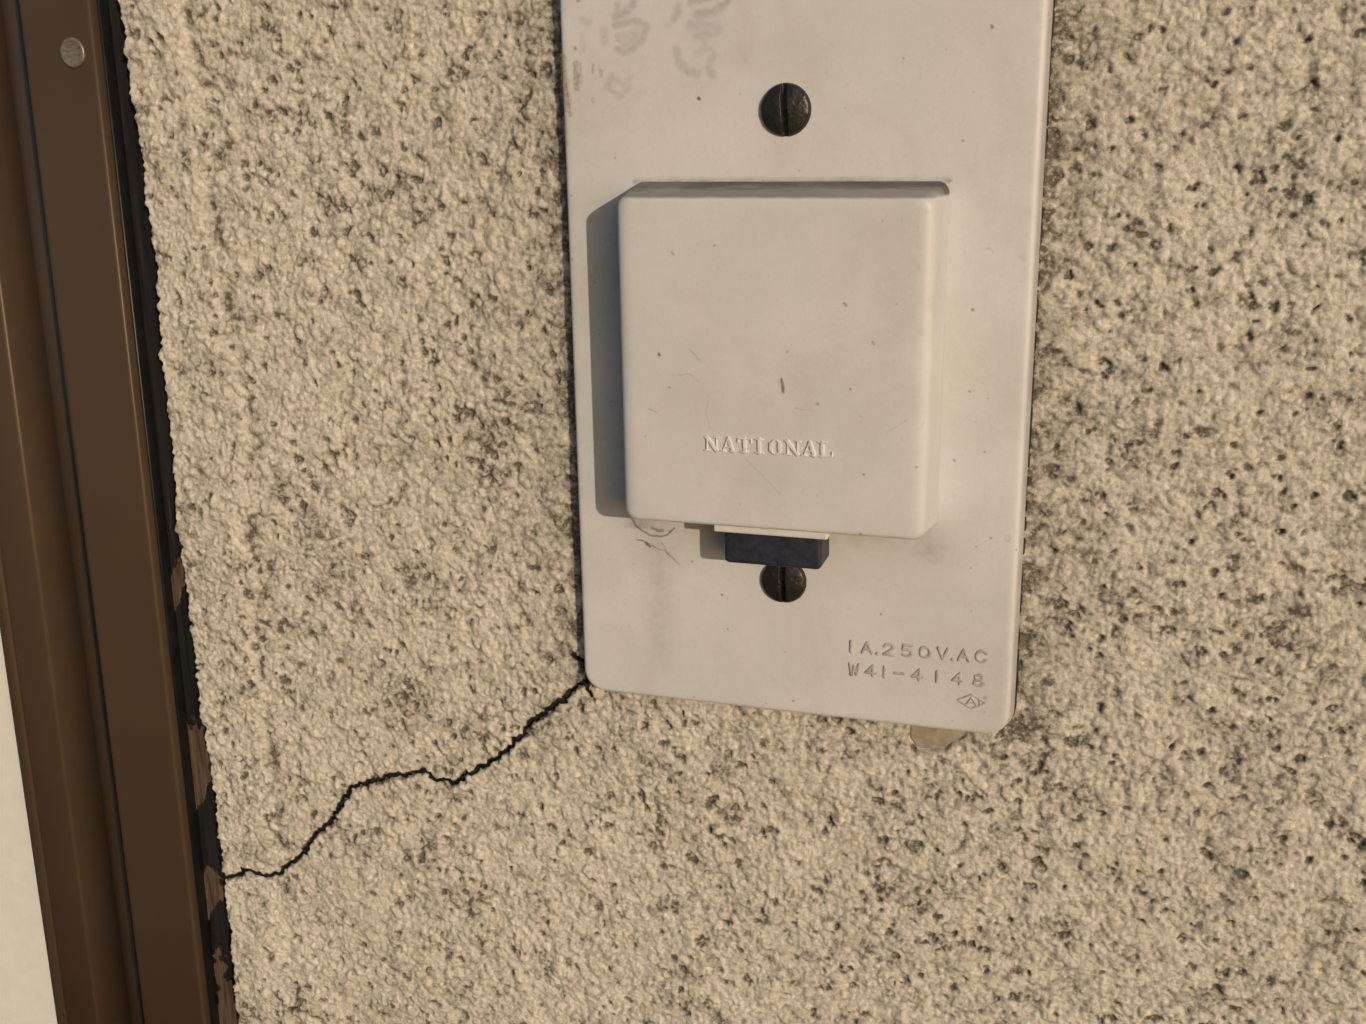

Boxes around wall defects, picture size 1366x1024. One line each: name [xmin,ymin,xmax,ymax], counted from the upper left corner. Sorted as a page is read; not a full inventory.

crack [222,653,593,879]